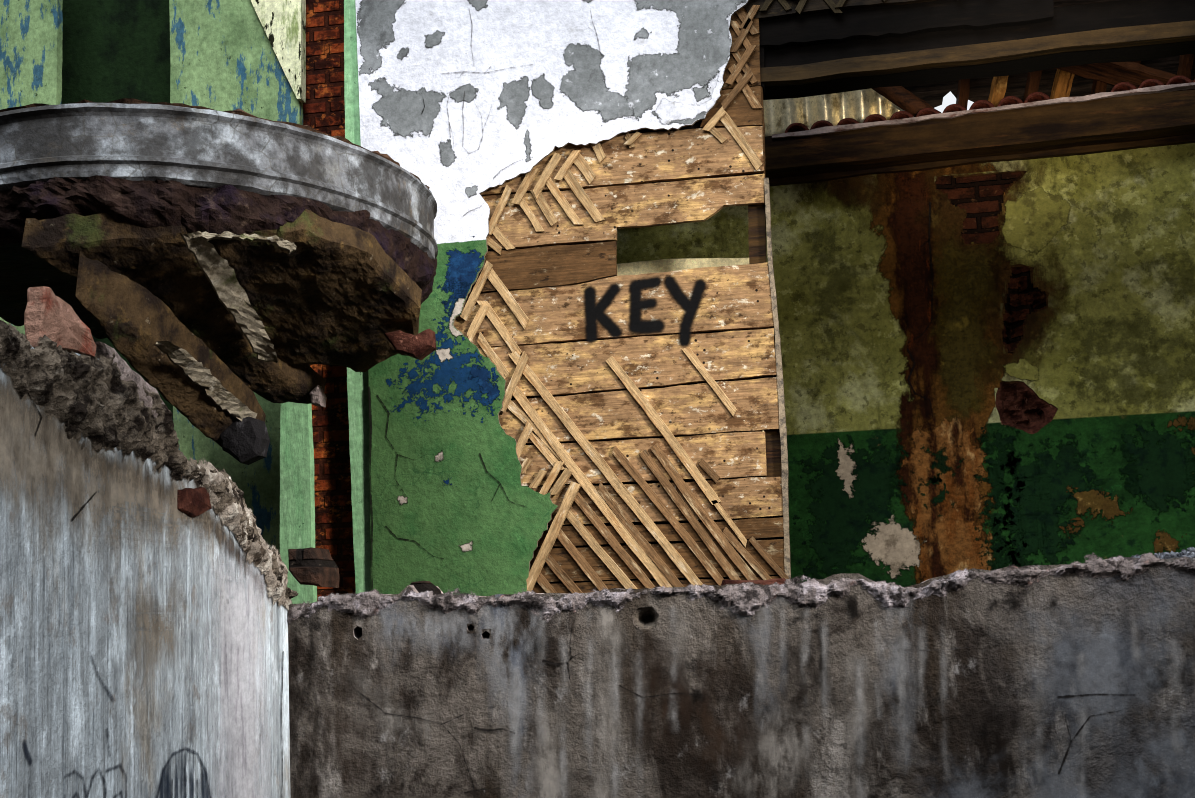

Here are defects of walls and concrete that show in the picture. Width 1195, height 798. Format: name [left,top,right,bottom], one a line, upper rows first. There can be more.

peeling [357,0,479,167]
peeling [497,0,747,162]
peeling [373,236,501,431]
rust [869,163,1013,584]
crack [368,386,444,591]
crack [479,454,523,506]
spalling [0,320,1195,624]
leakage [0,377,265,798]
leakage [289,672,319,798]
leakage [535,719,563,798]
leakage [635,648,808,766]
crack [1057,694,1135,774]